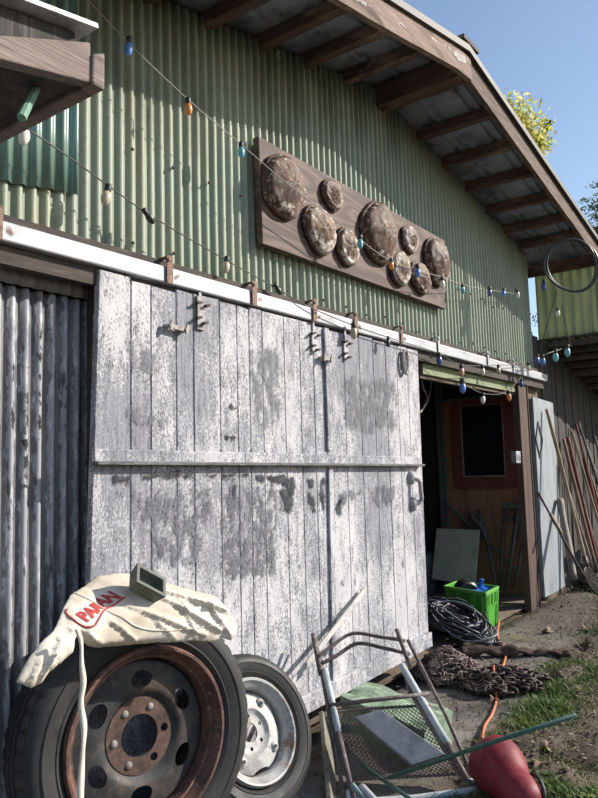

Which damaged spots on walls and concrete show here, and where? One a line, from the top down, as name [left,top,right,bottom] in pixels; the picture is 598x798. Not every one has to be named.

peeling [126,339,157,375]
peeling [249,346,286,430]
peeling [341,375,399,435]
peeling [112,470,296,580]
peeling [307,475,328,513]
peeling [336,482,396,517]